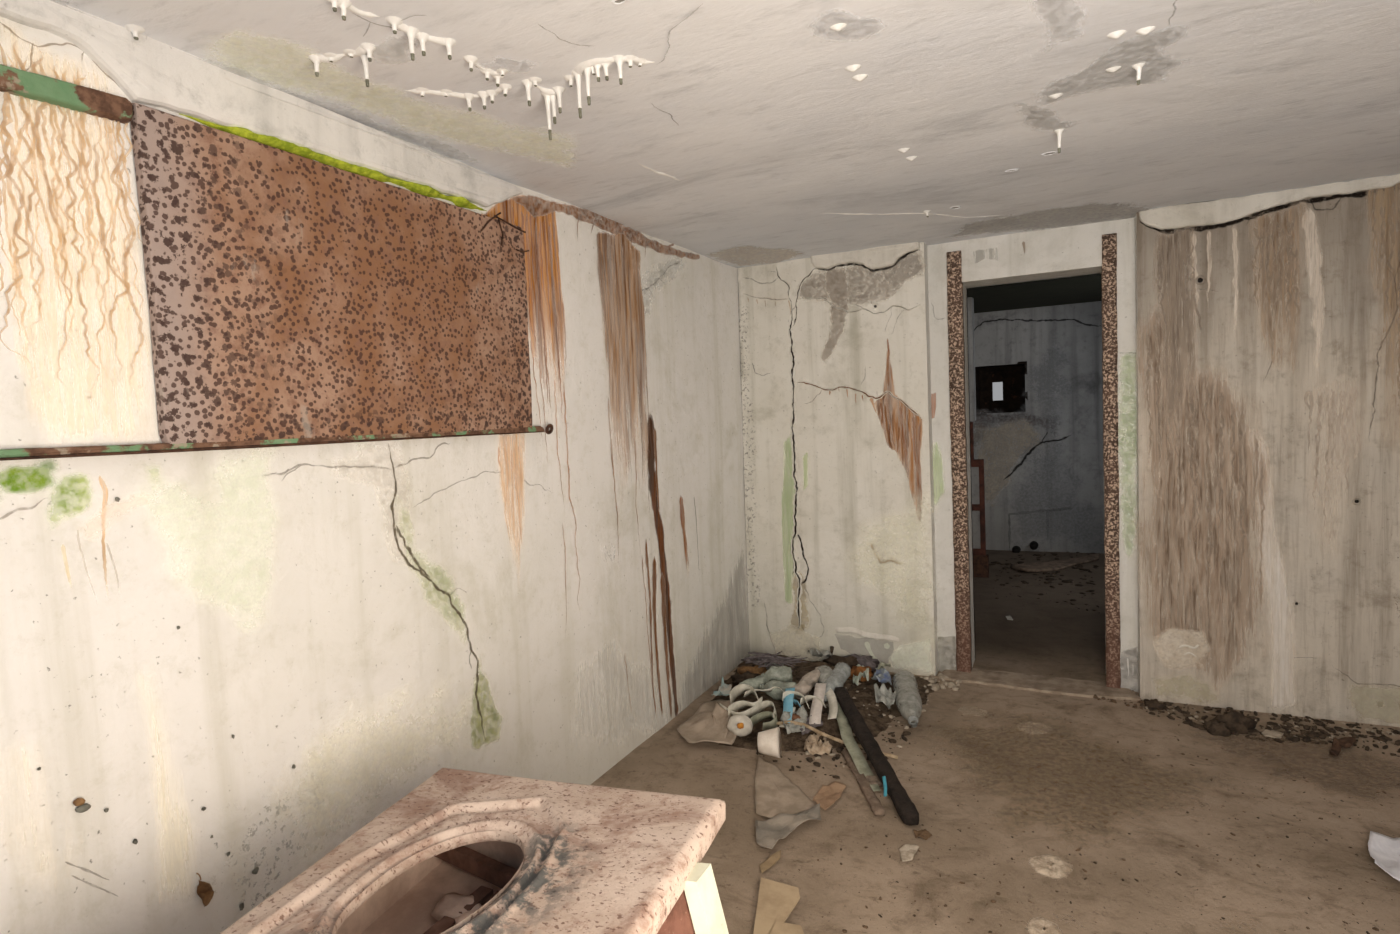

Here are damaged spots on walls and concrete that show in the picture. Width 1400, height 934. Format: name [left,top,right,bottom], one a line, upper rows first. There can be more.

leakage [0,45,85,85]
leakage [226,0,654,161]
leakage [0,92,144,369]
crack [1084,185,1400,234]
leakage [1232,206,1324,359]
leakage [61,477,118,582]
crack [388,444,486,740]
rust [482,195,700,716]
crack [748,250,923,636]
rust [876,339,936,522]
leakage [1121,648,1139,692]
leakage [1139,230,1292,706]